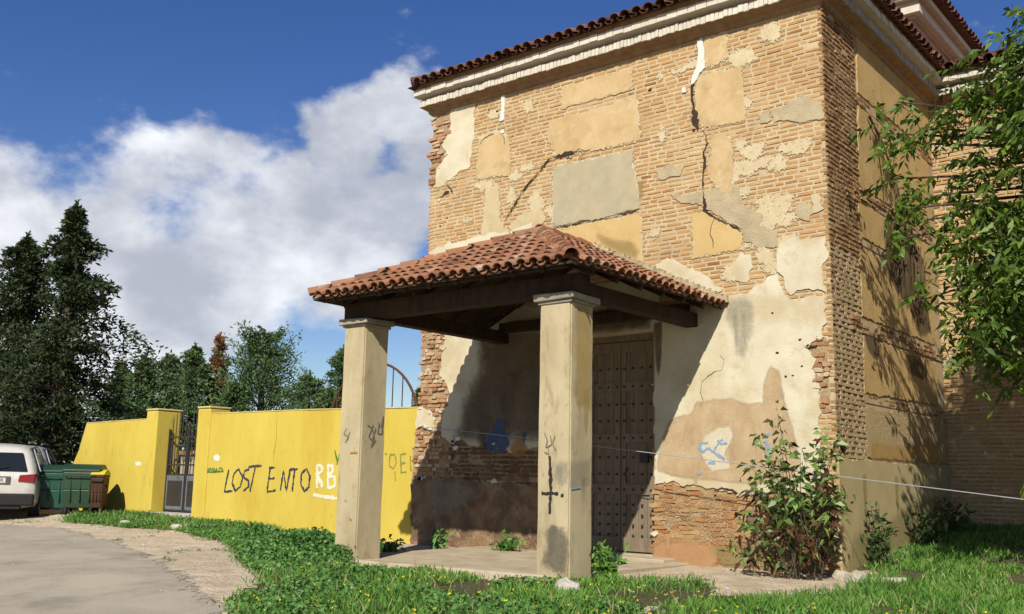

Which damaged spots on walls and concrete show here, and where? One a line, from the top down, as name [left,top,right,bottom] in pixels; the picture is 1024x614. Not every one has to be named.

spalling [426,111,451,187]
crack [505,147,585,234]
crack [690,82,740,244]
leakage [724,298,755,360]
spalling [412,330,538,485]
spalling [649,479,840,575]